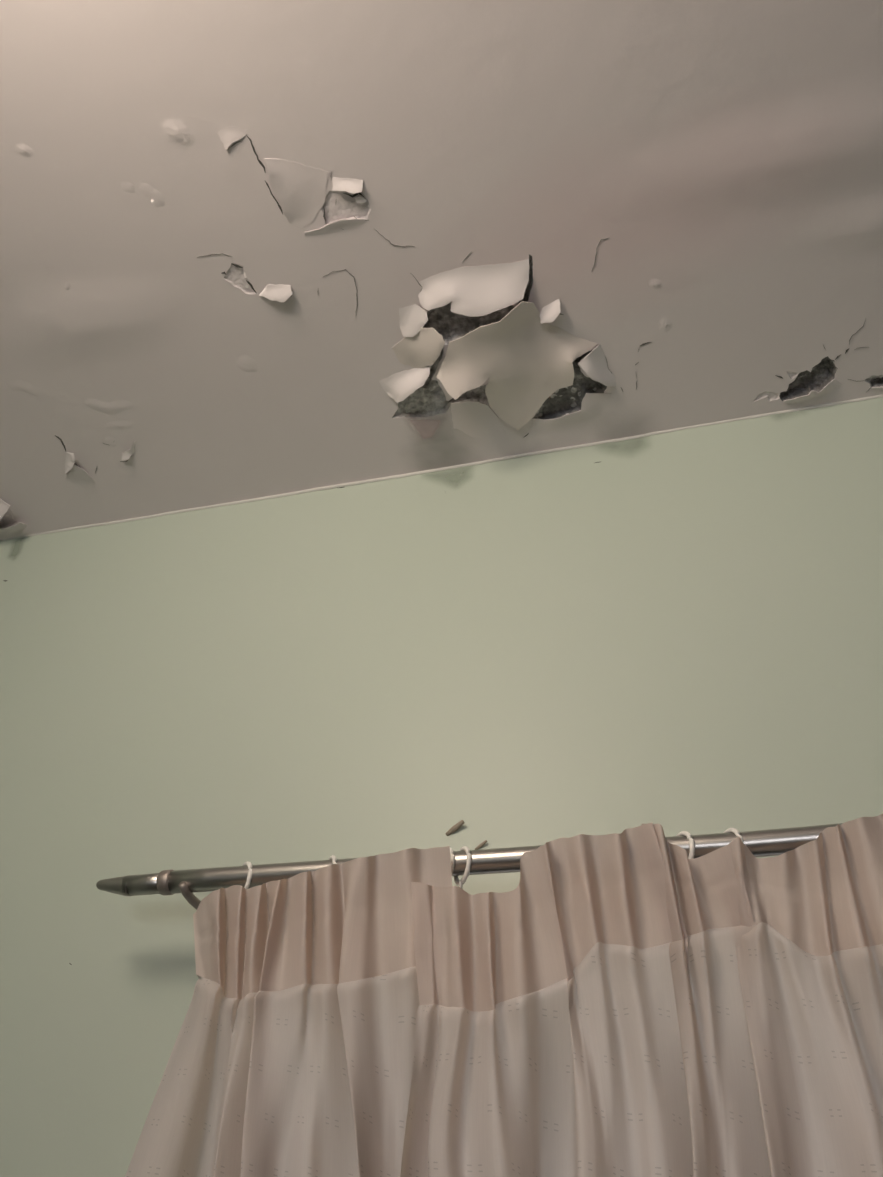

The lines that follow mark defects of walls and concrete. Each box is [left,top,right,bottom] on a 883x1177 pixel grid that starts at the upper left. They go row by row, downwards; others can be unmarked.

peeling [305,177,415,247]
peeling [199,253,292,303]
peeling [379,254,618,453]
spalling [753,319,883,405]
peeling [0,499,27,539]